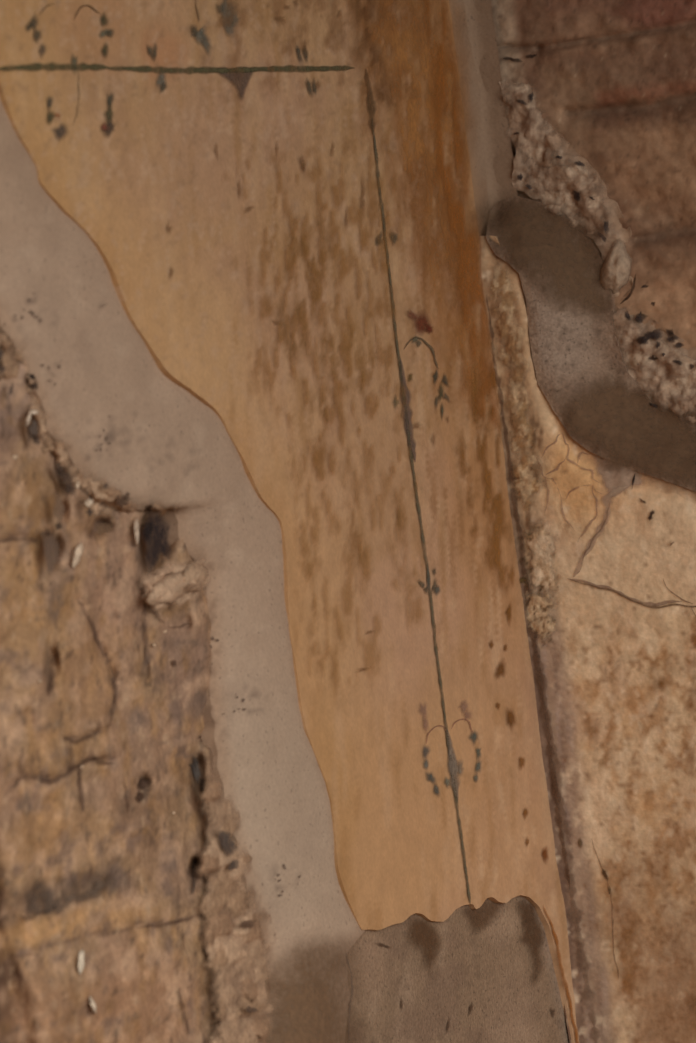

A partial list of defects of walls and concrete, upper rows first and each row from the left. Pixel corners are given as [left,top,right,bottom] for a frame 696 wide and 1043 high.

flaking render [499,79,696,425]
spalling [0,292,179,573]
peeling [490,267,542,509]
crack [487,299,590,996]
peeling [525,520,561,639]
crack [538,433,696,614]
spalling [20,876,115,918]
spalling [136,778,151,802]
spalling [190,758,274,1043]